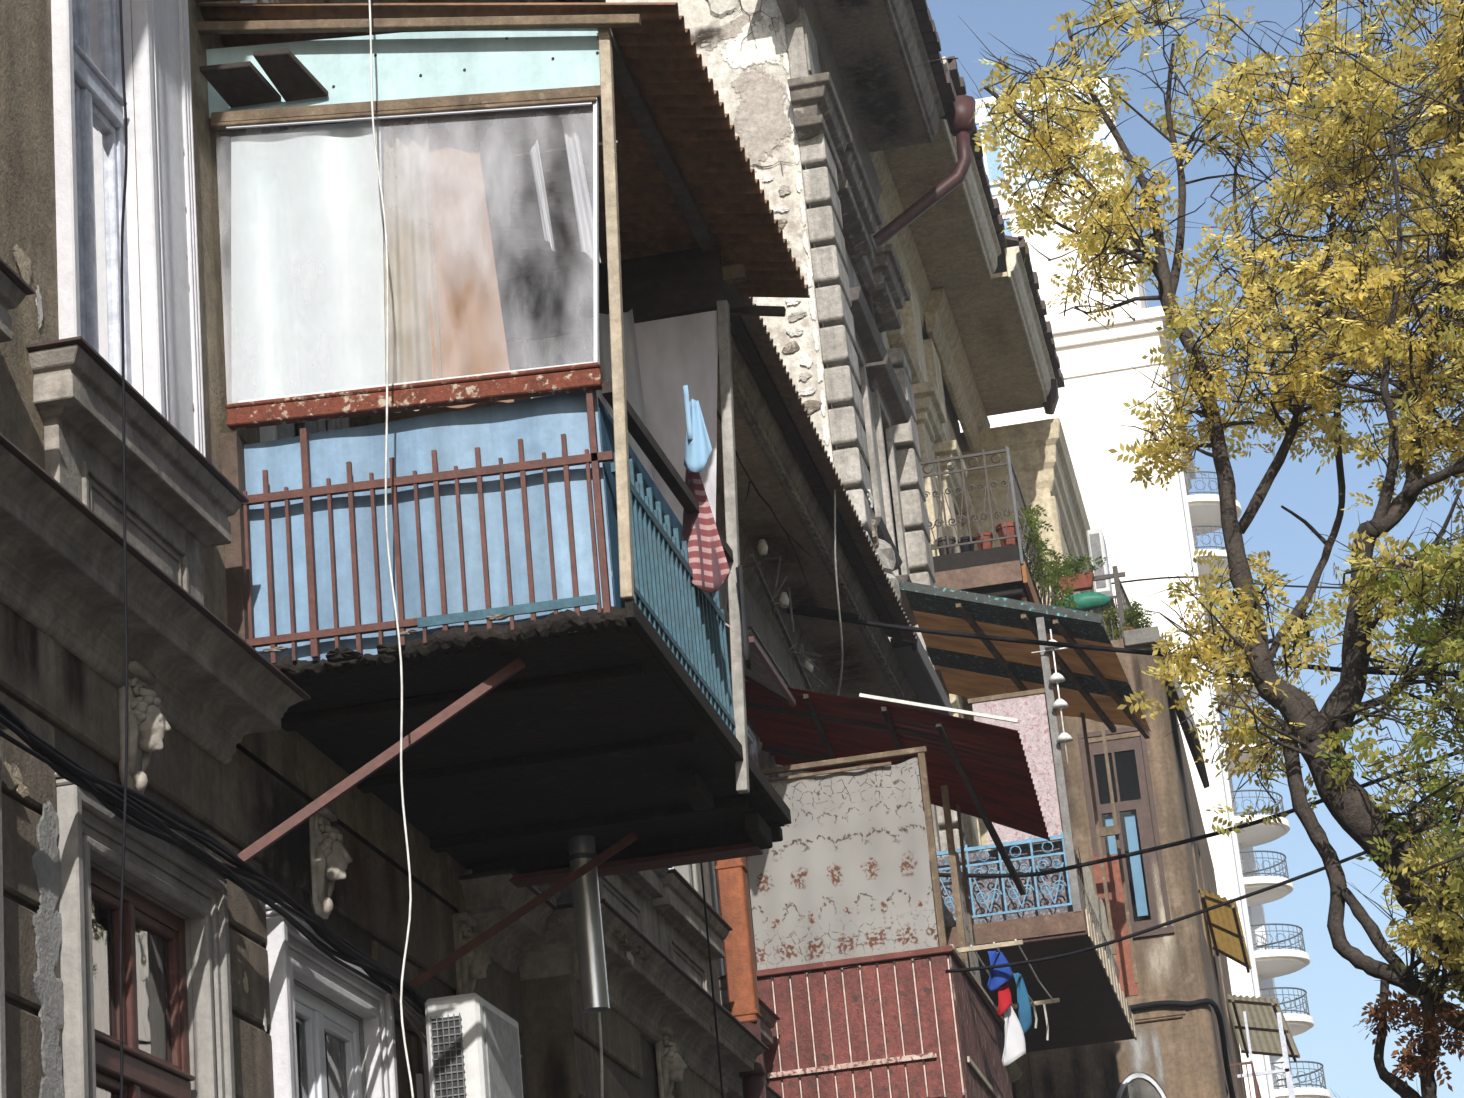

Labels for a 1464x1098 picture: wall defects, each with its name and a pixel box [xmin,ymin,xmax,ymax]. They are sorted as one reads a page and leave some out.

spalling [698,0,830,445]
peeling [1,761,65,1098]